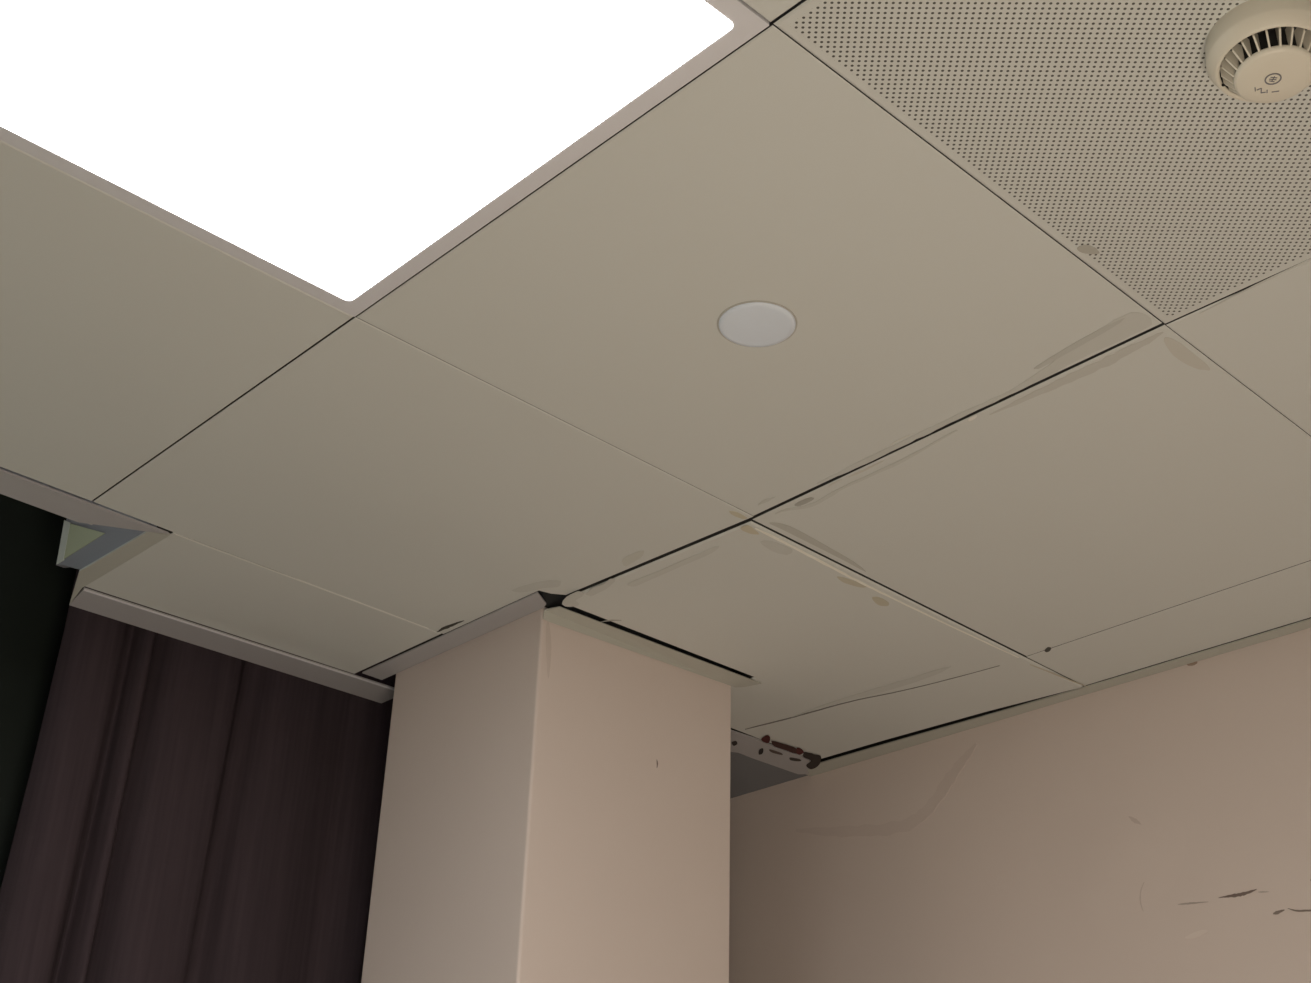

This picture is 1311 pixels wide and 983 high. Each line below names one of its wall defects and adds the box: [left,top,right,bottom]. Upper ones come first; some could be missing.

corrosion [761,735,804,755]